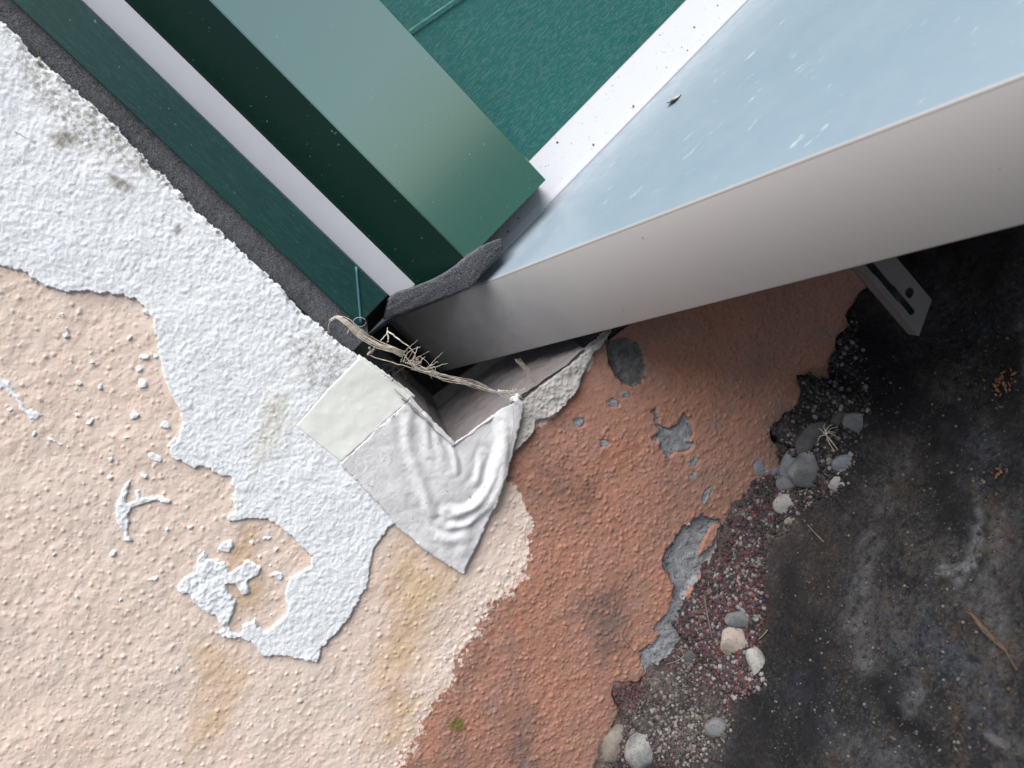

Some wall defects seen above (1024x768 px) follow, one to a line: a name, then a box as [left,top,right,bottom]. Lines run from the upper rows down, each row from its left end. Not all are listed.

flaking render [0,21,394,663]
flaking render [513,329,646,453]
spalling [651,410,698,479]
spalling [639,486,723,671]